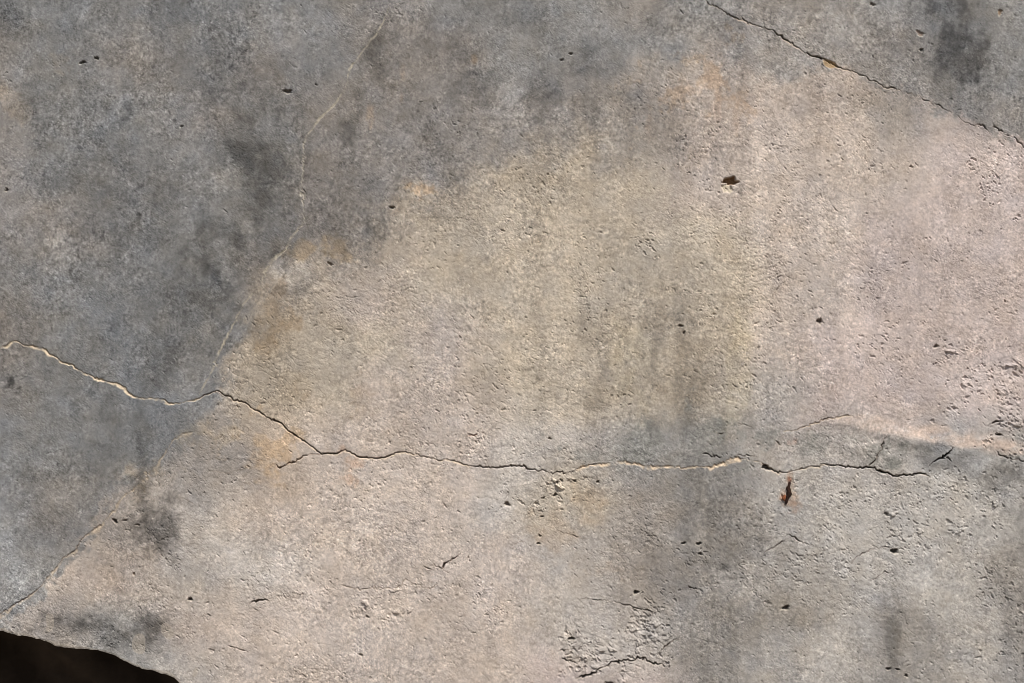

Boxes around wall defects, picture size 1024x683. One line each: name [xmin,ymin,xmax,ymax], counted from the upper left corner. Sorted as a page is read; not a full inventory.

crack [703,0,1024,149]
crack [0,6,956,479]
rust [776,472,801,516]